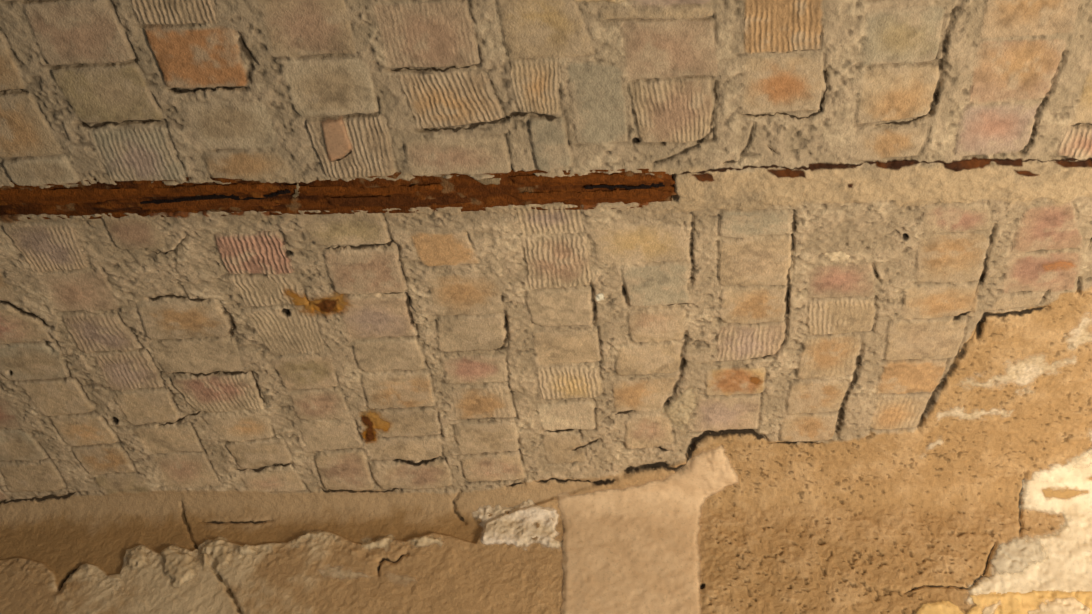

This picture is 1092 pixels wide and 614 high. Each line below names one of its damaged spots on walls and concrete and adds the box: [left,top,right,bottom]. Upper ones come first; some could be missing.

crack [878,9,955,125]
crack [654,52,1092,188]
rust [0,183,280,223]
rust [507,174,673,210]
rust [286,290,349,315]
crack [763,215,797,359]
crack [920,307,1044,423]
rust [362,411,390,442]
crack [510,355,862,487]
peeling [1042,450,1092,499]
peeling [992,539,1046,574]
peeling [917,590,1092,614]